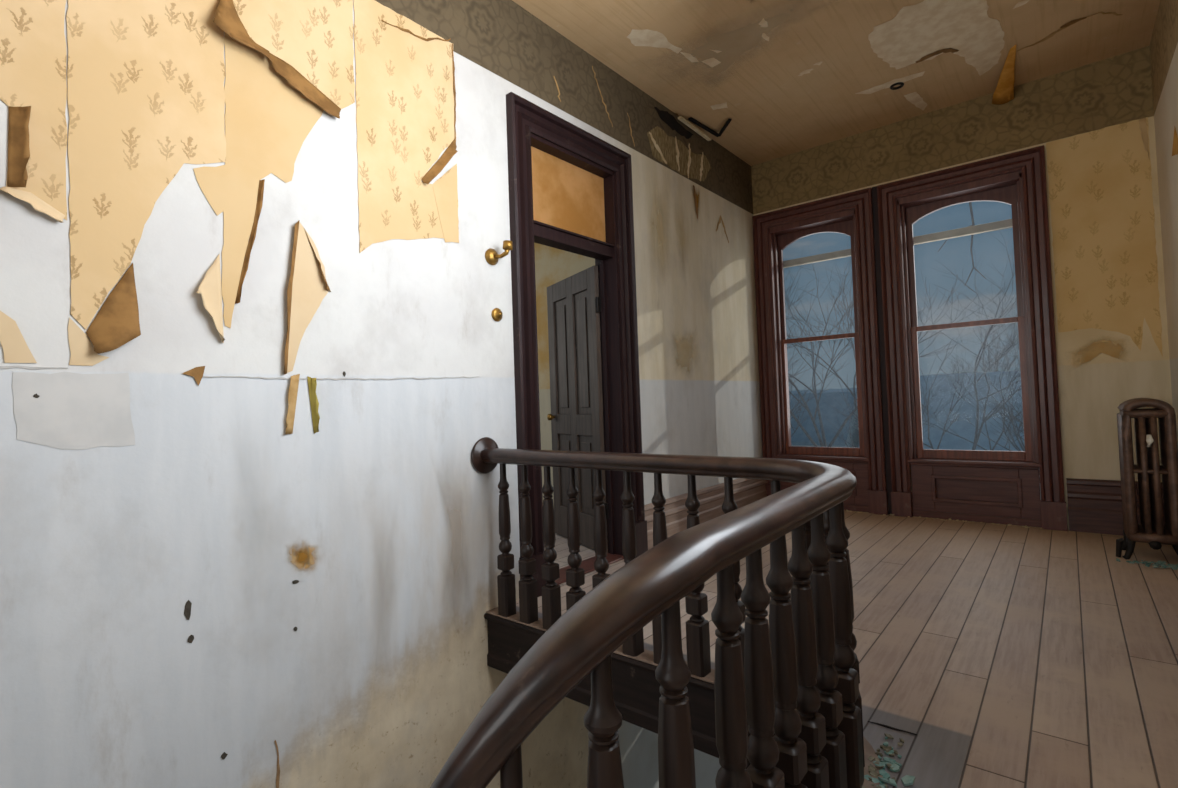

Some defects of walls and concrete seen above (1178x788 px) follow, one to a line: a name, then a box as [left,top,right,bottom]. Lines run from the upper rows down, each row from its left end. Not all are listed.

spalling [627,29,722,67]
spalling [856,0,1005,110]
crack [1017,12,1123,52]